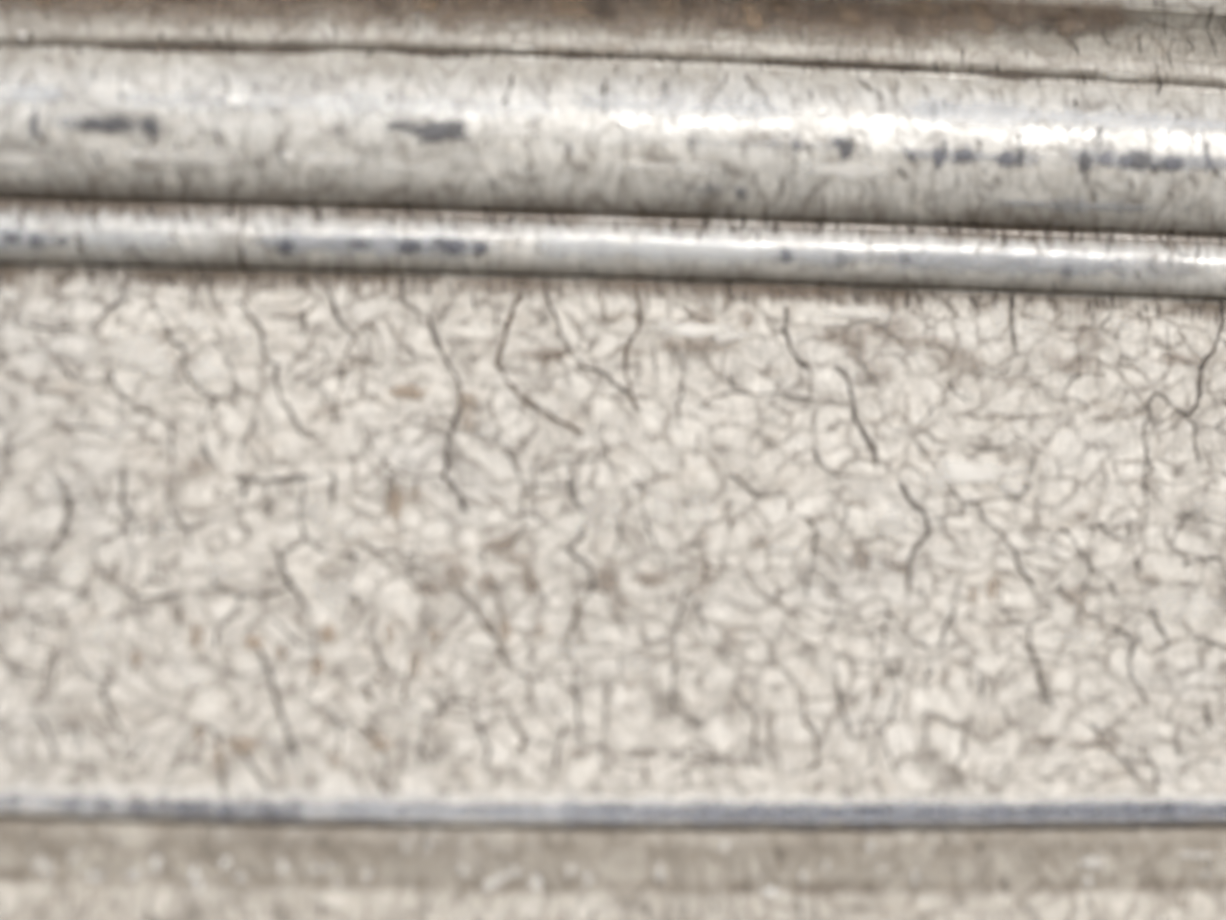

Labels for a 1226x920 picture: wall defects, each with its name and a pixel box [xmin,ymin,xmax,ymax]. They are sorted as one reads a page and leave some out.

crack [1176,115,1218,175]
crack [0,46,1130,655]
crack [1088,228,1226,471]
crack [258,647,312,761]
crack [873,615,899,728]
crack [1008,616,1053,707]
crack [1097,610,1169,694]
crack [1208,640,1226,648]
crack [176,725,270,807]
crack [1095,727,1158,790]